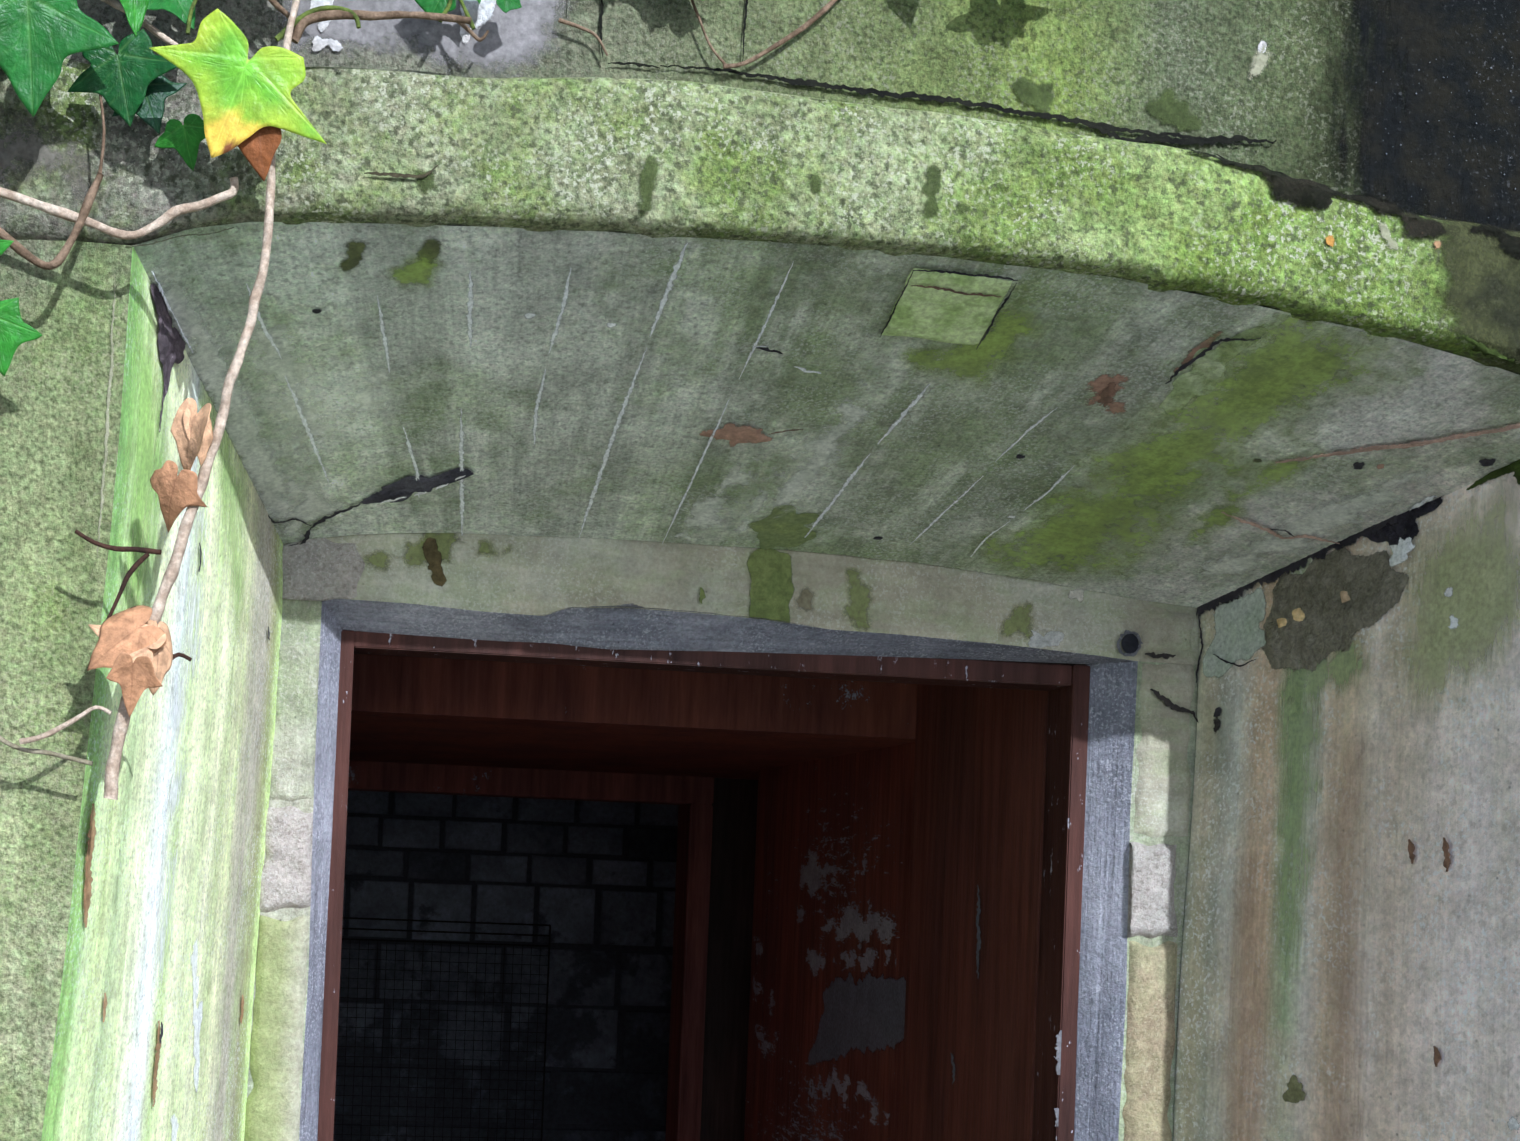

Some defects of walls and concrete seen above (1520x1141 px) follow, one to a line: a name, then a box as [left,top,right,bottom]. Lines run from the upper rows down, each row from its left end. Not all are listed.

crack [566,0,1276,146]
damp [1334,0,1520,363]
crack [268,467,473,546]
rust [699,423,803,447]
rust [1086,374,1128,414]
crack [1275,423,1520,470]
crack [1145,495,1444,723]
spalling [1262,546,1409,709]
peeling [745,767,906,1141]